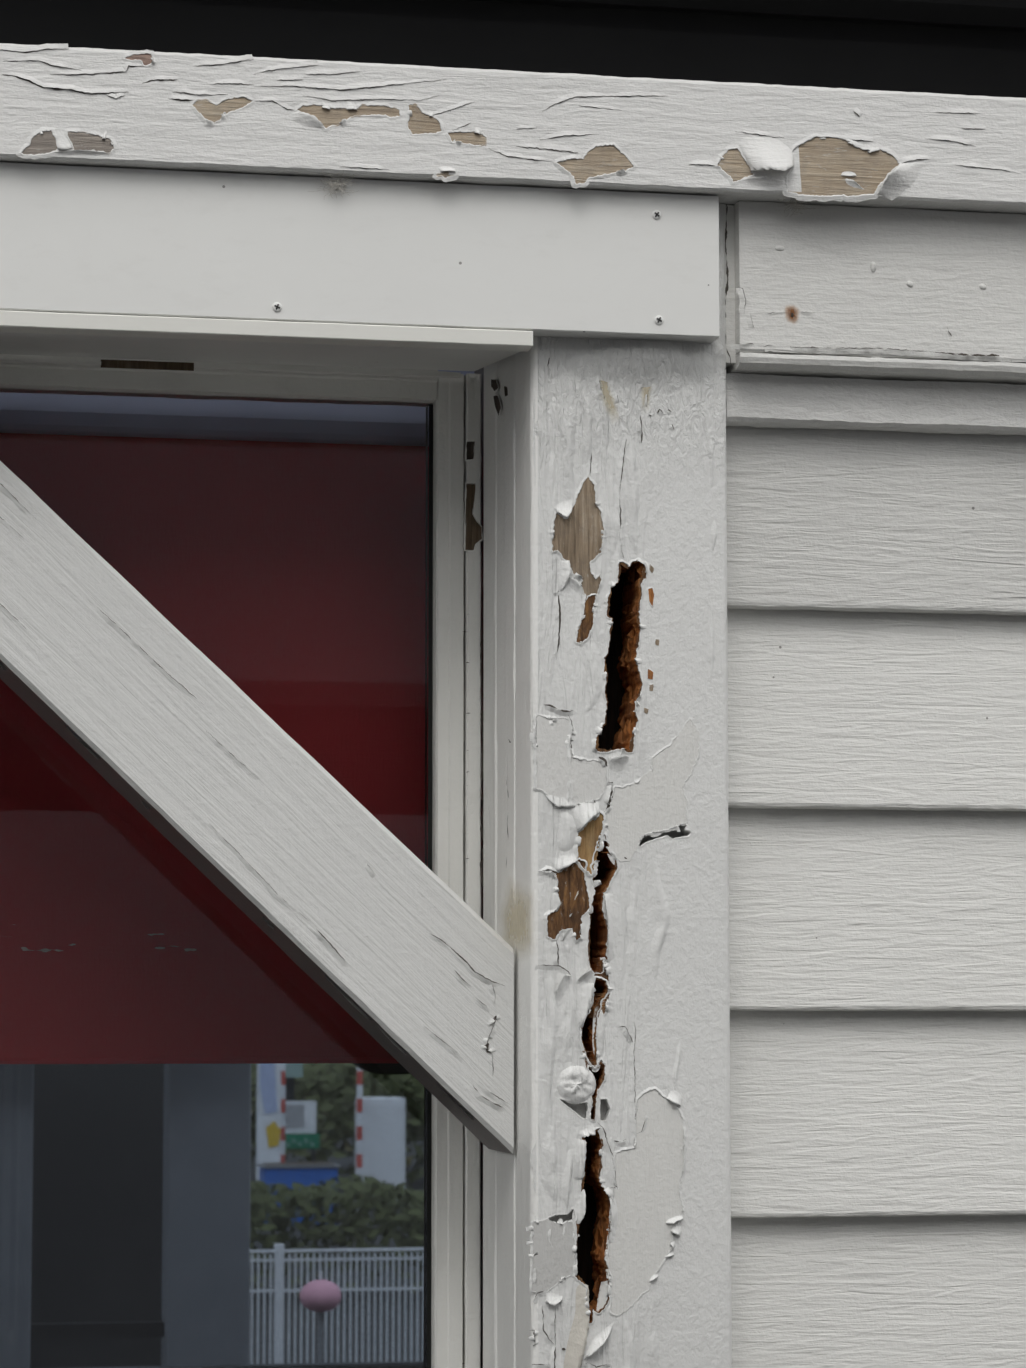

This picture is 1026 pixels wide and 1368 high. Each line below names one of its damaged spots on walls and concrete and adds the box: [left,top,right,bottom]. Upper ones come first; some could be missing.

peeling [121,50,157,68]
peeling [16,126,118,160]
peeling [189,94,255,129]
peeling [288,100,488,148]
peeling [432,166,459,182]
peeling [553,142,637,189]
peeling [713,132,925,203]
peeling [526,475,701,1368]